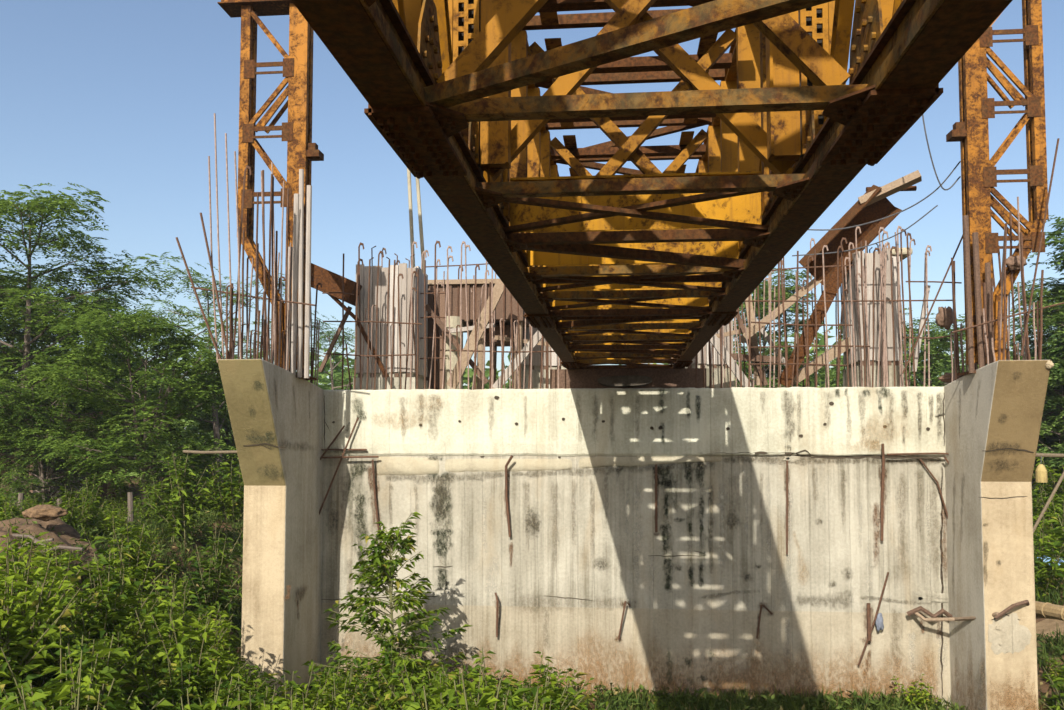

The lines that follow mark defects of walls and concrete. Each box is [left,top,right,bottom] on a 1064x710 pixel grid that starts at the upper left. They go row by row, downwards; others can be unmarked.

leakage [393,473,460,555]
corrosion [505,455,513,565]
leakage [569,455,712,589]
leakage [725,456,941,484]
corrosion [756,603,773,639]
corrosion [858,572,889,675]